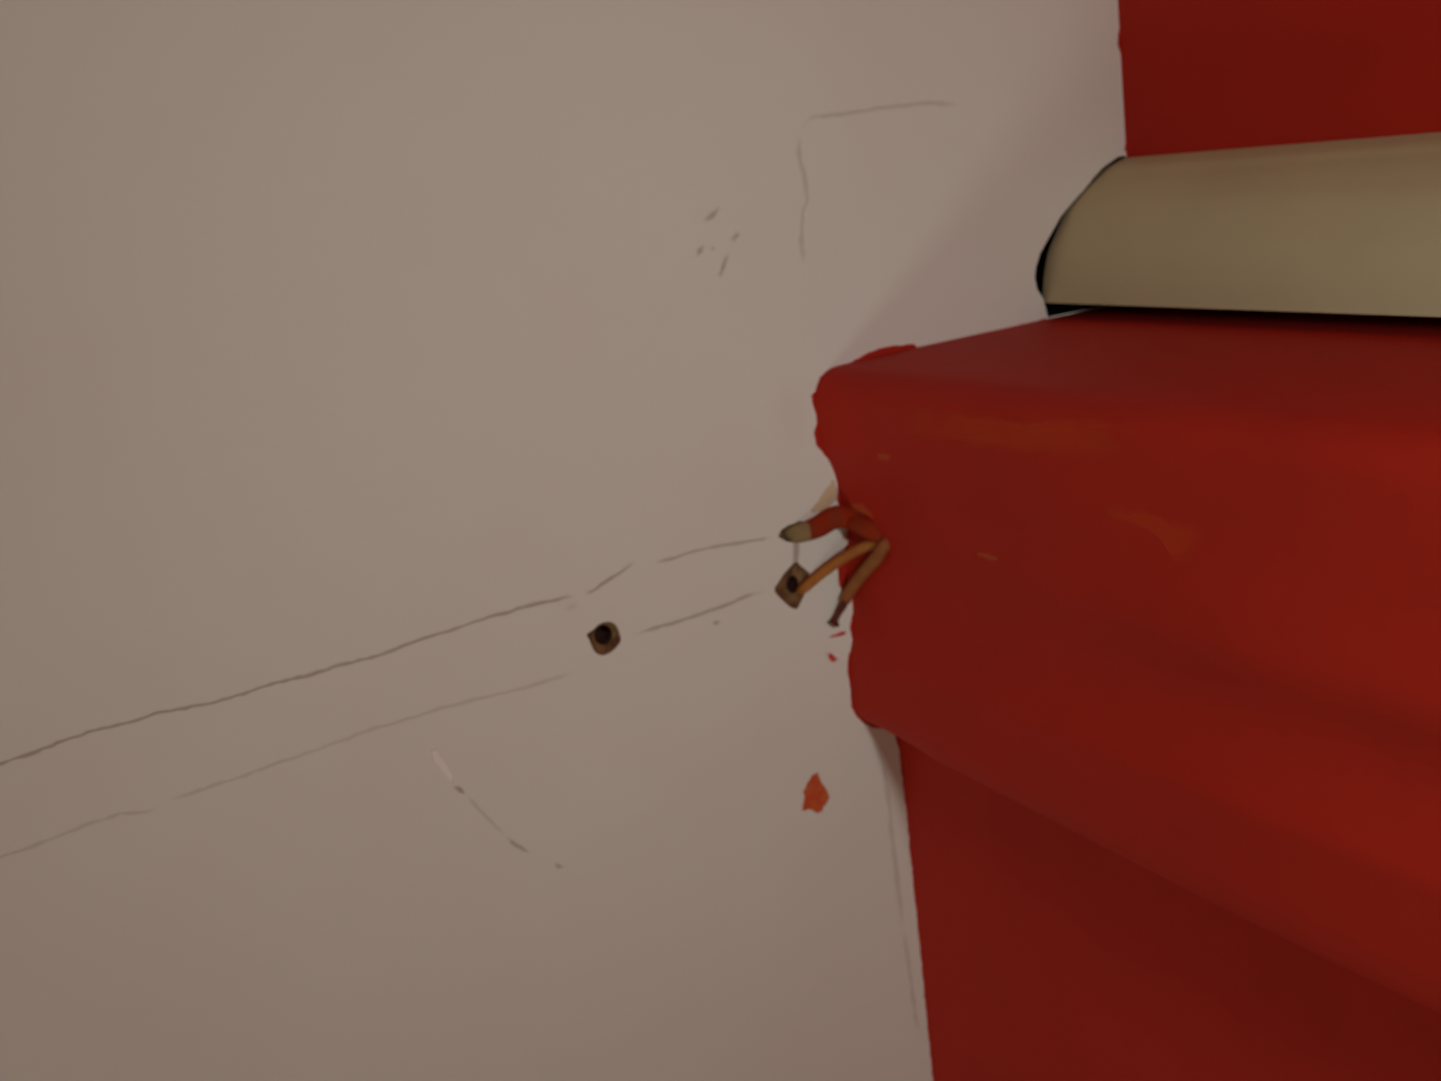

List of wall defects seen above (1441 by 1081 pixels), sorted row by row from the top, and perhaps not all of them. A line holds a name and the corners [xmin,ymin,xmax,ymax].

spalling [778,480,837,543]
spalling [775,562,810,609]